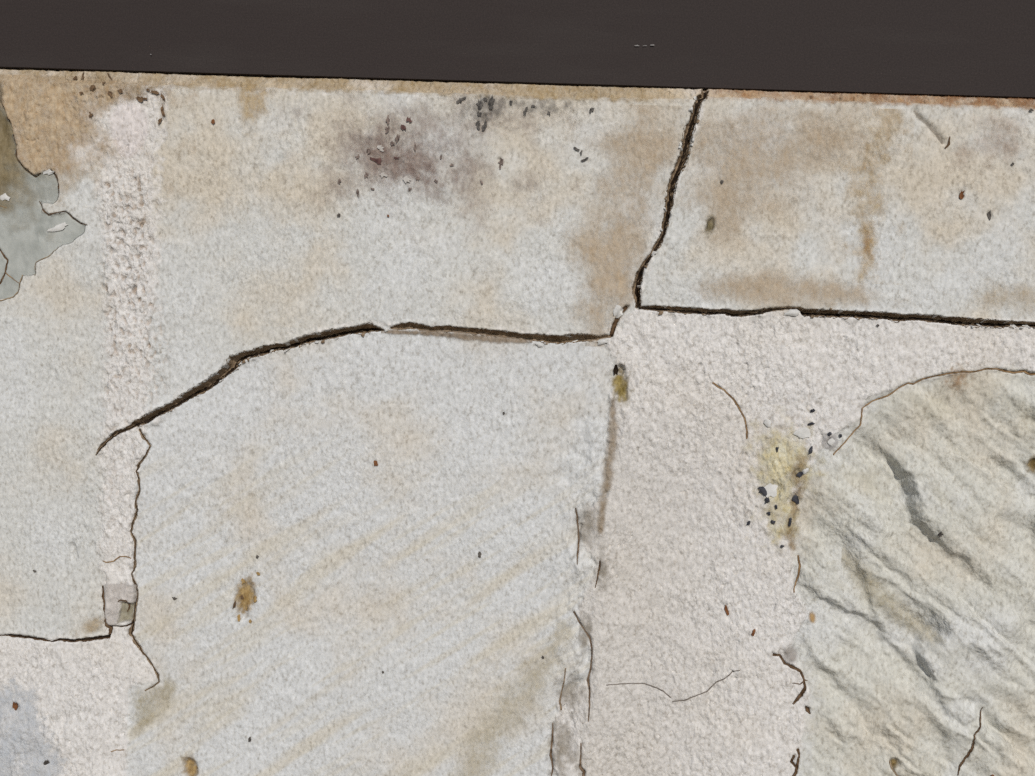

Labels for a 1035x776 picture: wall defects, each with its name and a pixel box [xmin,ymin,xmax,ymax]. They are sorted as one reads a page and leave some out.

water stain [349,115,483,195]
peeling [0,84,87,301]
water stain [721,274,863,302]
crack [0,91,1035,691]
crack [607,670,740,702]
crack [773,648,811,714]
crack [958,707,983,775]